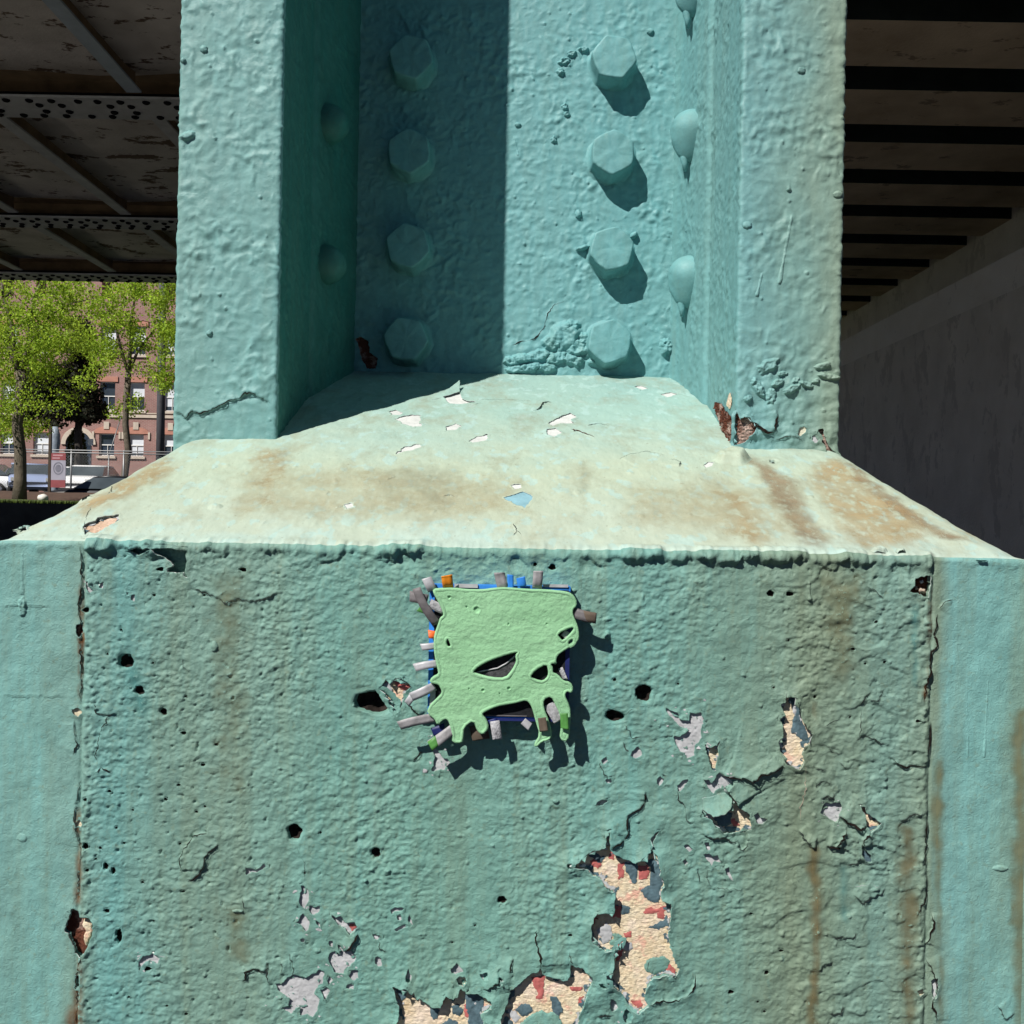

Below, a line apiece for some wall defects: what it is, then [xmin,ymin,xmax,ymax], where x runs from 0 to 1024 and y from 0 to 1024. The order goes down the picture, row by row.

crack [180,392,263,419]
peeling [386,409,425,428]
peeling [544,412,579,438]
peeling [79,513,123,537]
rust [823,463,916,527]
crack [191,588,283,604]
peeling [775,689,816,773]
peeling [653,699,771,884]
crack [179,828,216,881]
spalling [61,905,97,991]
peeling [265,882,417,1021]
peeling [389,828,683,1024]